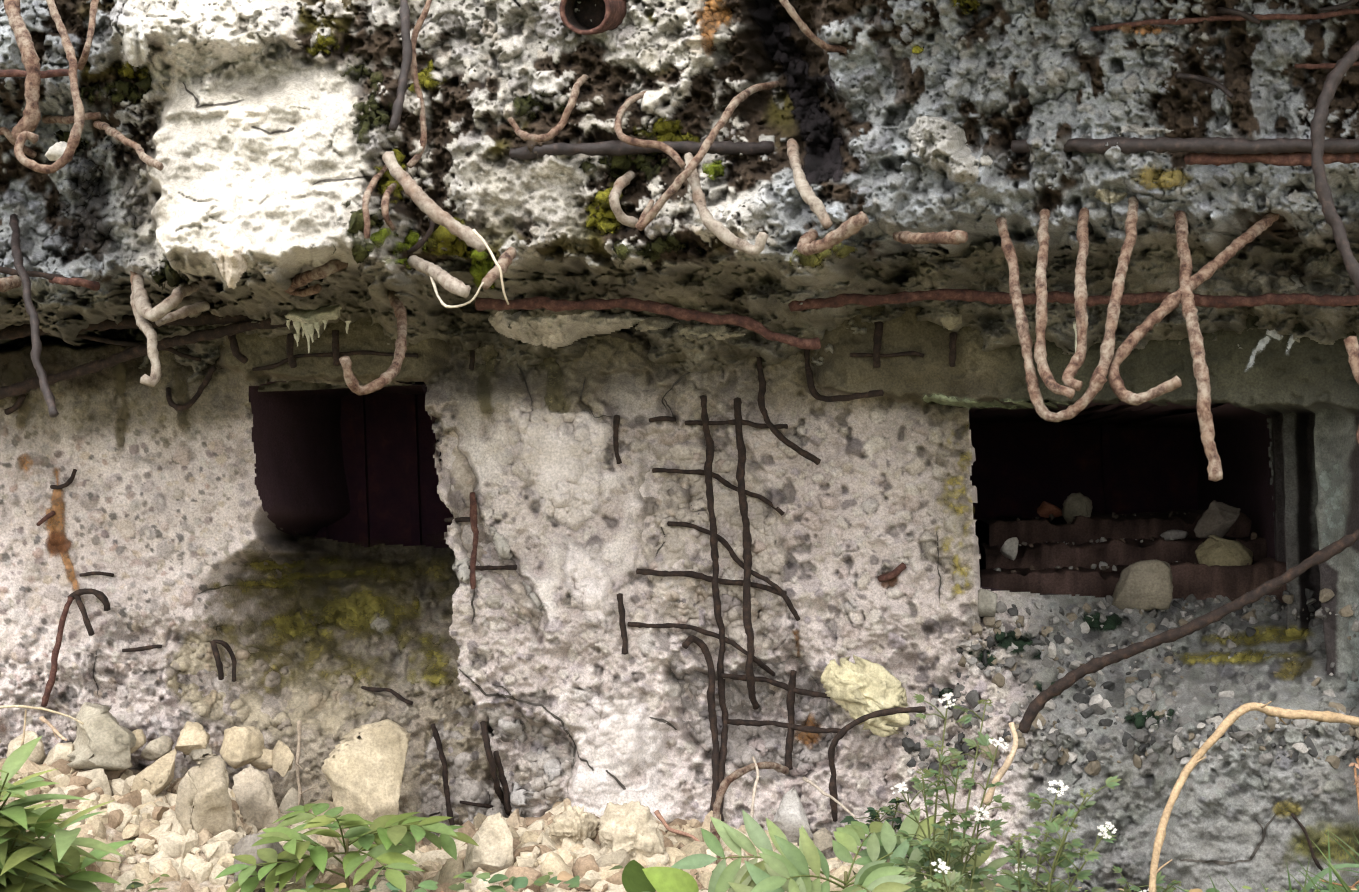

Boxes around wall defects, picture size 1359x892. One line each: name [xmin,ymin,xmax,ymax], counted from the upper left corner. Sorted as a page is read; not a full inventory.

efflorescence [284,305,351,353]
spalling [488,310,745,349]
rust [18,454,32,470]
rust [45,468,79,591]
water stain [241,557,449,686]
spalling [637,442,837,779]
peeling [579,692,646,763]
rust [795,715,821,746]